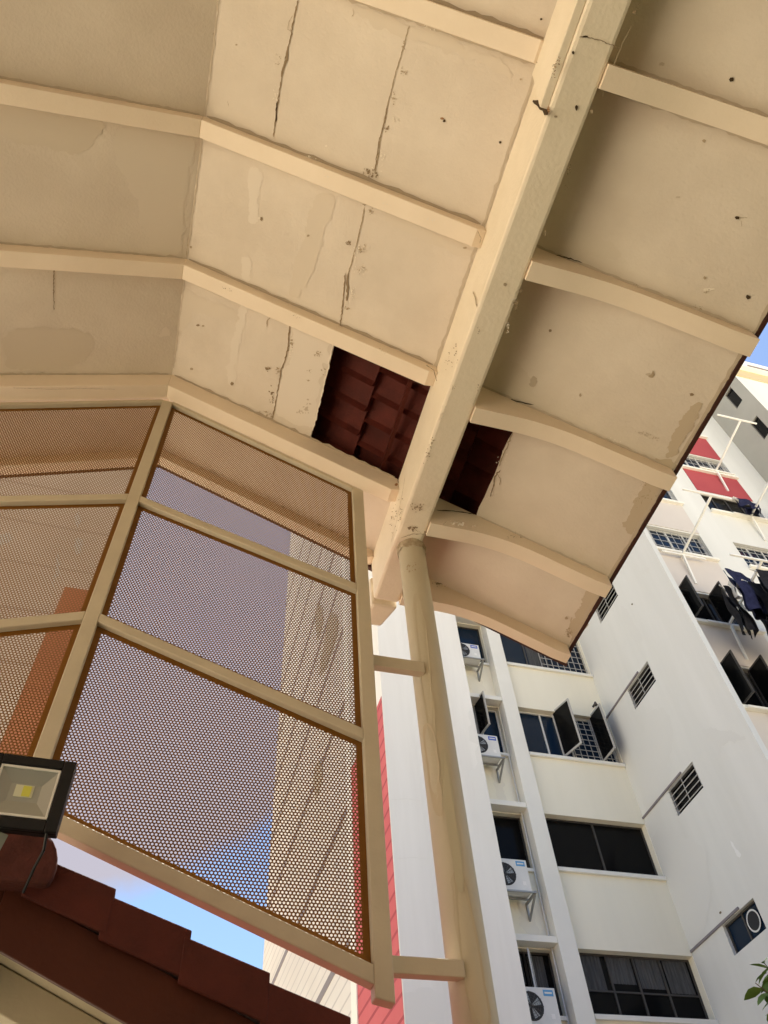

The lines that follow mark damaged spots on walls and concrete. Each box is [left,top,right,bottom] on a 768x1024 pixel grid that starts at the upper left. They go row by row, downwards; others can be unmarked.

crack [273,1,298,137]
crack [374,27,410,173]
crack [340,207,365,326]
crack [266,318,290,419]